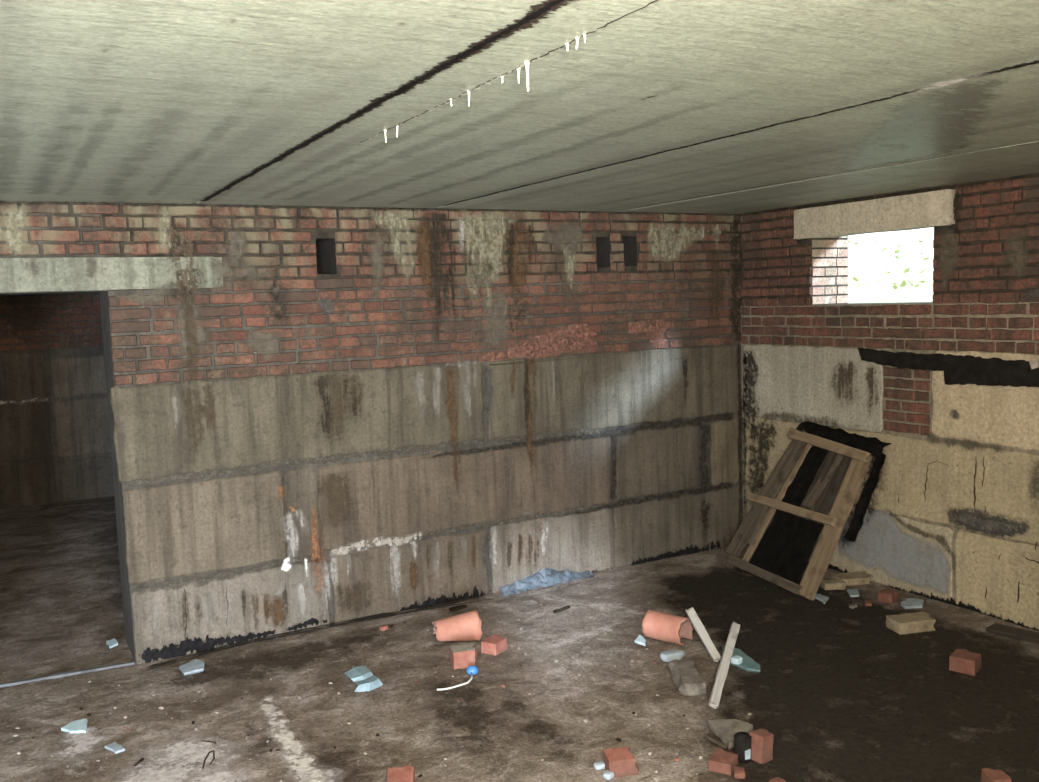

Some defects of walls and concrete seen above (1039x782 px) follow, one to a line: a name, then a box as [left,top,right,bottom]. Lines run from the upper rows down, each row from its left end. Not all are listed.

crack [360,0,658,143]
leakage [0,0,1039,448]
corrosion [446,365,461,482]
leakage [433,217,837,534]
leakage [928,434,1001,452]
crack [973,457,986,513]
corrosion [281,507,324,592]